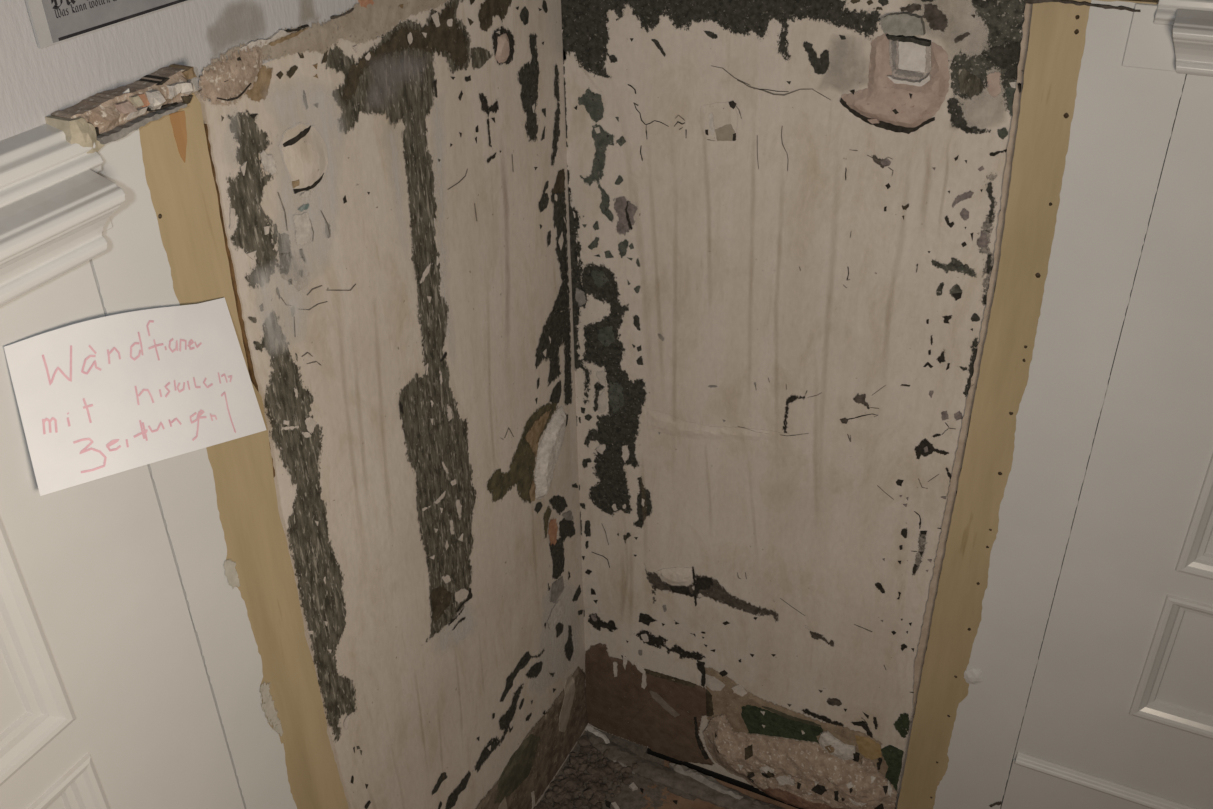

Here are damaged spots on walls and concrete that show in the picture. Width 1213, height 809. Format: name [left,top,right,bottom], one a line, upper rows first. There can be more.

peeling [947,0,1141,156]
peeling [916,155,1001,397]
peeling [45,0,948,809]
peeling [877,411,963,507]